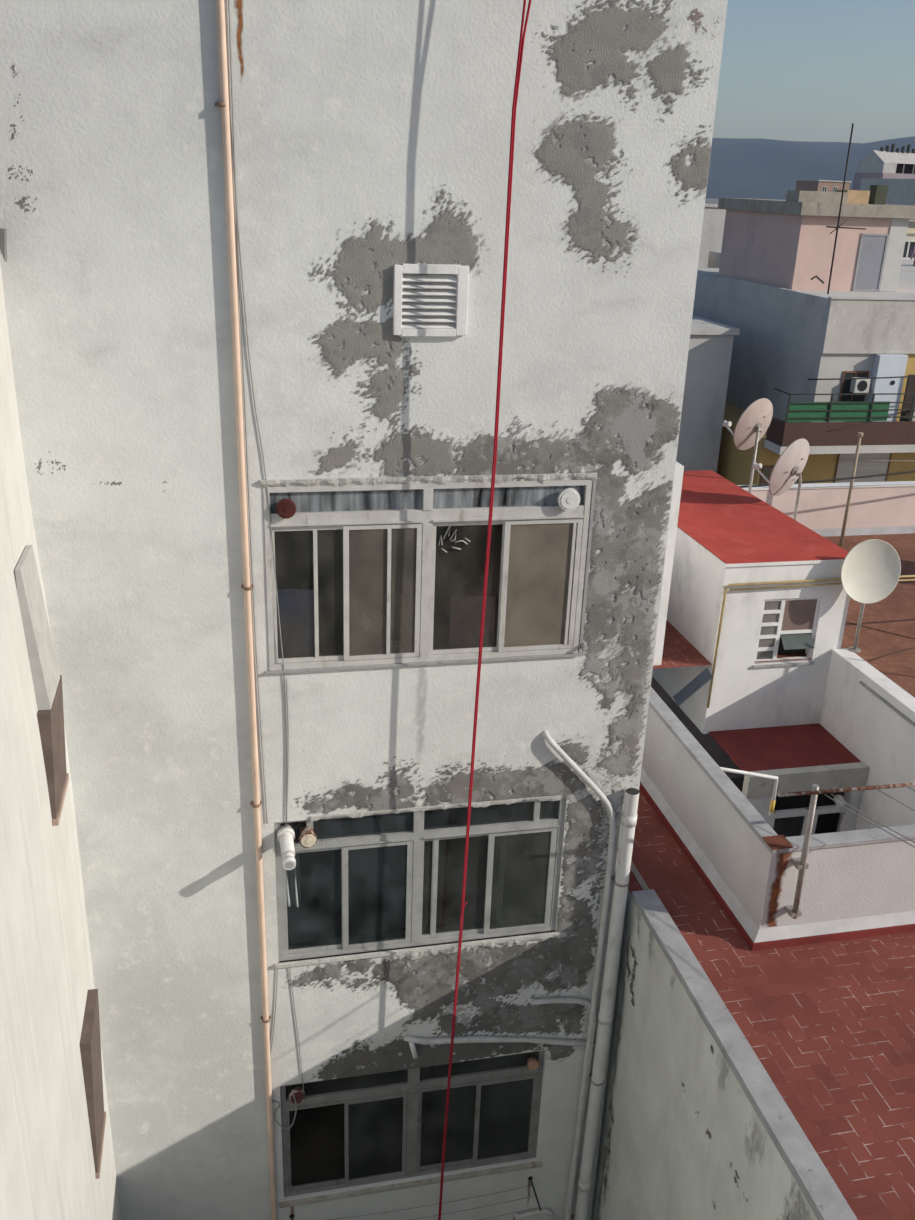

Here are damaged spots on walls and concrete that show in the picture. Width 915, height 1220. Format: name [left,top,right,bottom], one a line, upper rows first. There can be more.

corrosion [235,0,244,75]
peeling [687,9,719,37]
peeling [556,794,617,946]
corrosion [767,852,792,927]
peeling [544,1044,574,1060]